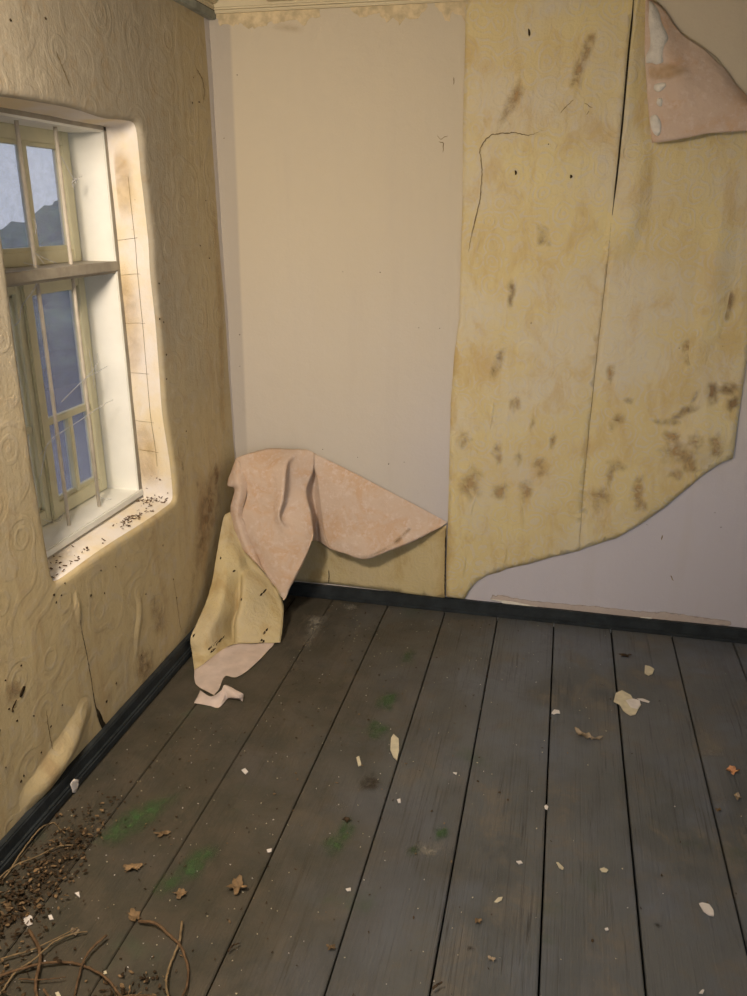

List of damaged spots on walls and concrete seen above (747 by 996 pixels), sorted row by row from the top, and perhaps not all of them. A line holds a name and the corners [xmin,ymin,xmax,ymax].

peeling [645,0,747,143]
crack [469,130,542,248]
leakage [709,385,737,408]